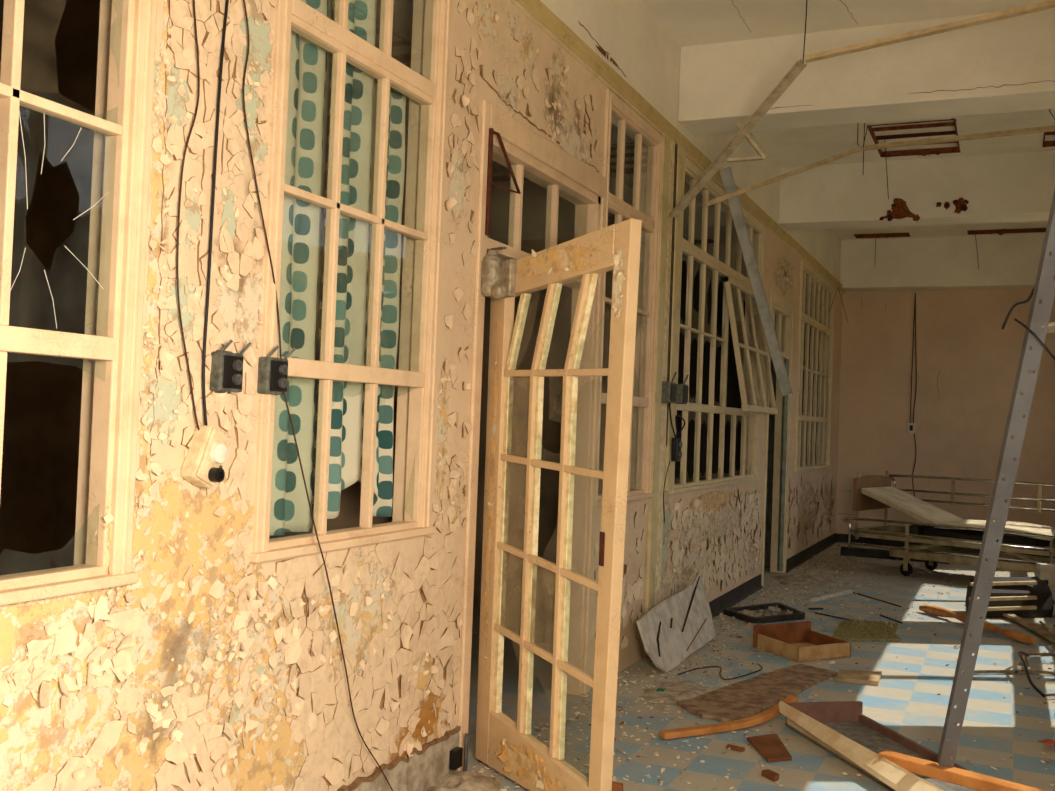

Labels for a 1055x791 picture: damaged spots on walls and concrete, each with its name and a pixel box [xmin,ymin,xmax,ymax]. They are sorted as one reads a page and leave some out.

peeling [497,73,522,117]
peeling [519,28,592,167]
rust [868,119,961,157]
peeling [0,0,404,791]
peeling [435,355,467,532]
flaking render [337,652,461,791]